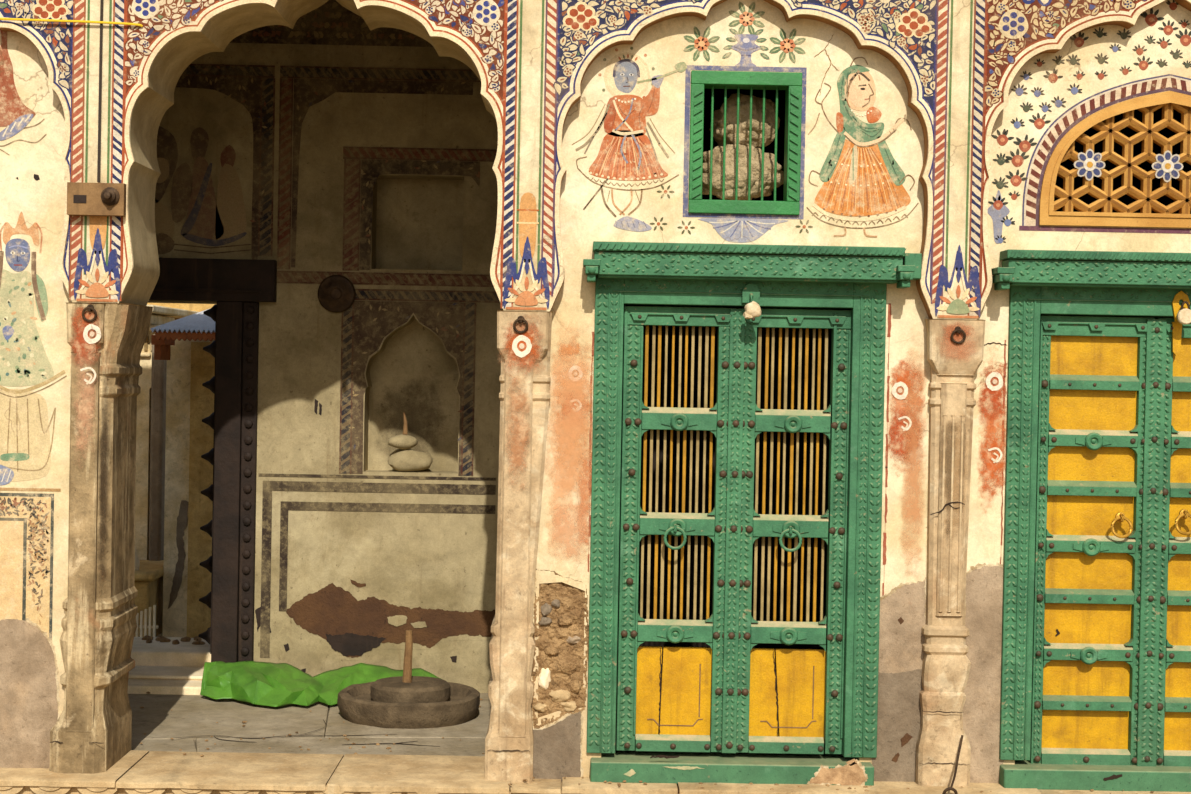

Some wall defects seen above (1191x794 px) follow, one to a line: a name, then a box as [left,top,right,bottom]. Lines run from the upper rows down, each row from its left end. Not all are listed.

crack [930,502,965,515]
flaking render [286,579,495,661]
flaking render [531,569,589,729]
flaking render [878,577,927,673]
peeling [807,759,868,786]